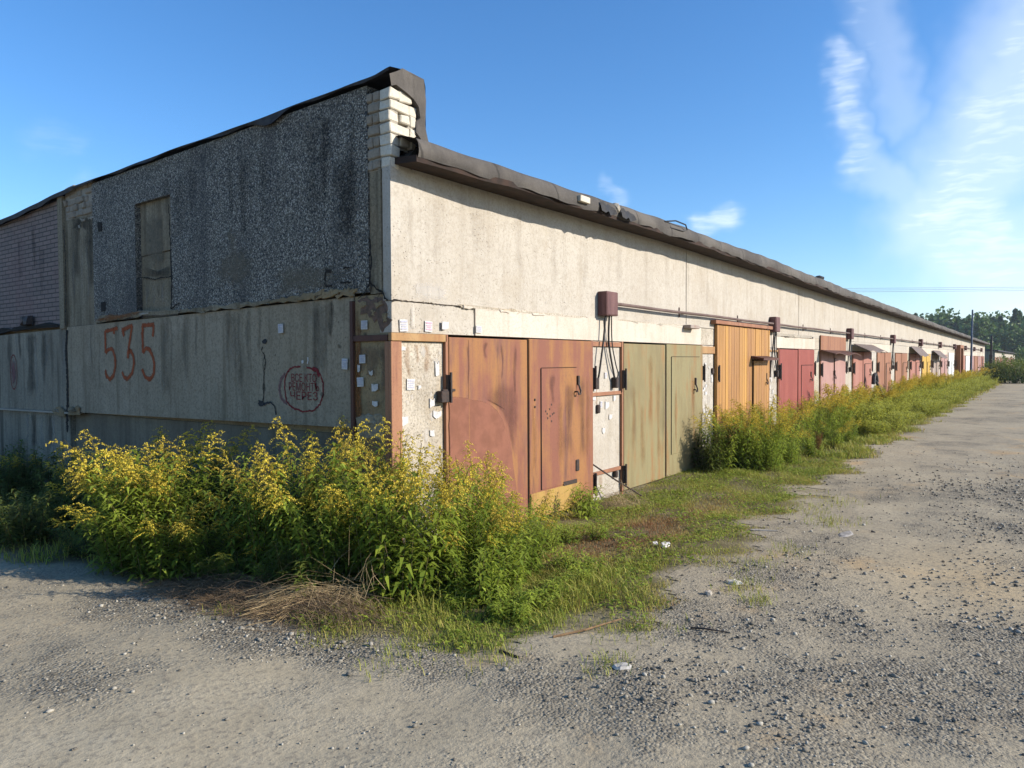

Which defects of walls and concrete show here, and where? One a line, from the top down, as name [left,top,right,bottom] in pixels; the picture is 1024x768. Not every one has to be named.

corrosion [449,397,518,516]